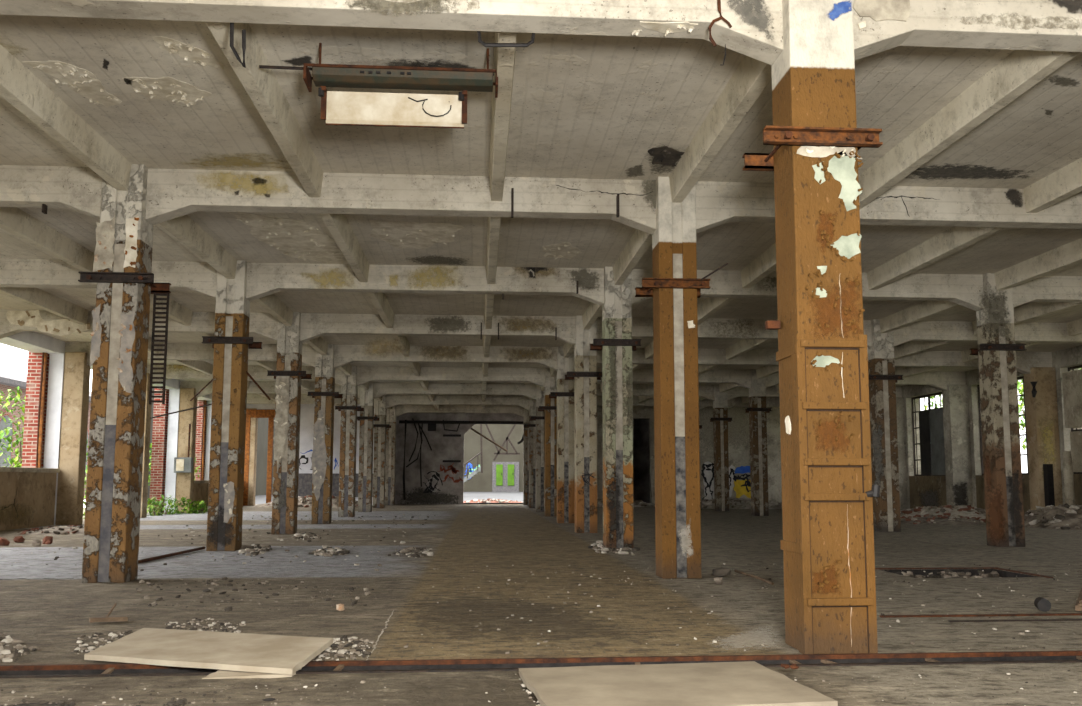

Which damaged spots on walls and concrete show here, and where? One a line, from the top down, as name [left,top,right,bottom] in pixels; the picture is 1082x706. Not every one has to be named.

water stain [351,0,457,14]
peeling [796,146,863,261]
water stain [908,164,1028,207]
peeling [93,217,139,272]
peeling [805,266,865,337]